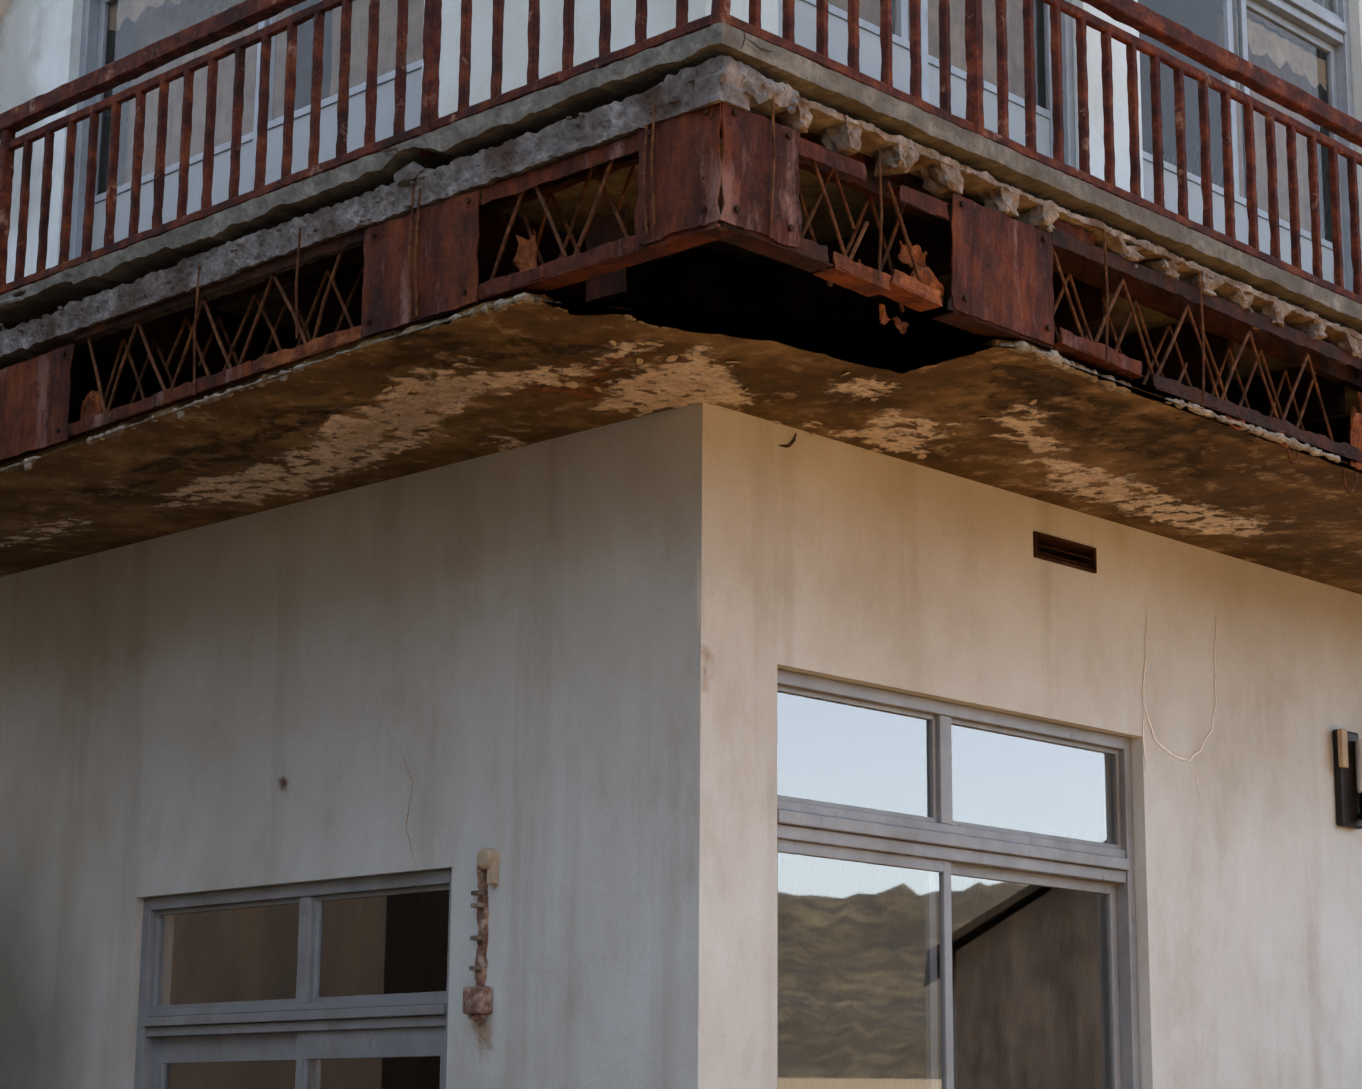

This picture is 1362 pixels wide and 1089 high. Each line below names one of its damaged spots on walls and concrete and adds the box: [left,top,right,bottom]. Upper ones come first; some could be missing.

spalling [0,55,1362,370]
leakage [81,406,341,499]
leakage [364,332,605,383]
corrosion [516,357,631,402]
spalling [999,341,1132,395]
leakage [988,366,1256,477]